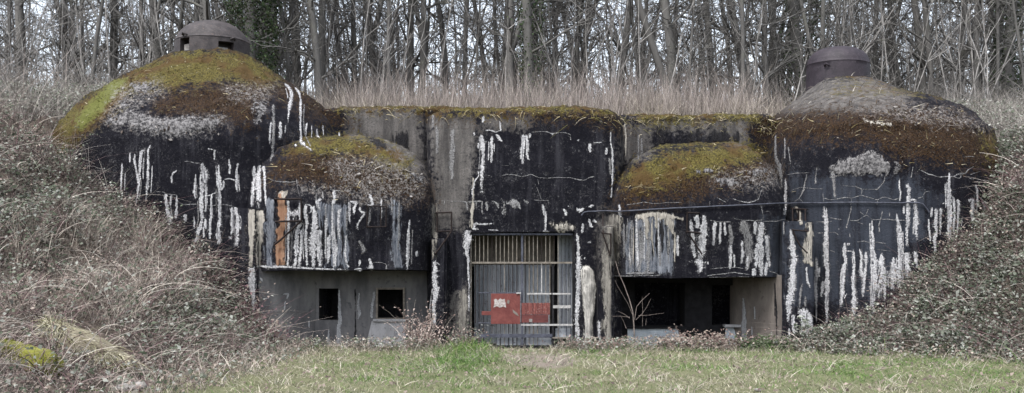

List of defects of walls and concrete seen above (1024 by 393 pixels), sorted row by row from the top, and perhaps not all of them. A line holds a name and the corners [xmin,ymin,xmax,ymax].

water stain [120,145,153,203]
rust [273,190,288,266]
water stain [164,84,419,310]
water stain [429,203,440,325]
water stain [519,133,531,164]
water stain [563,124,987,343]